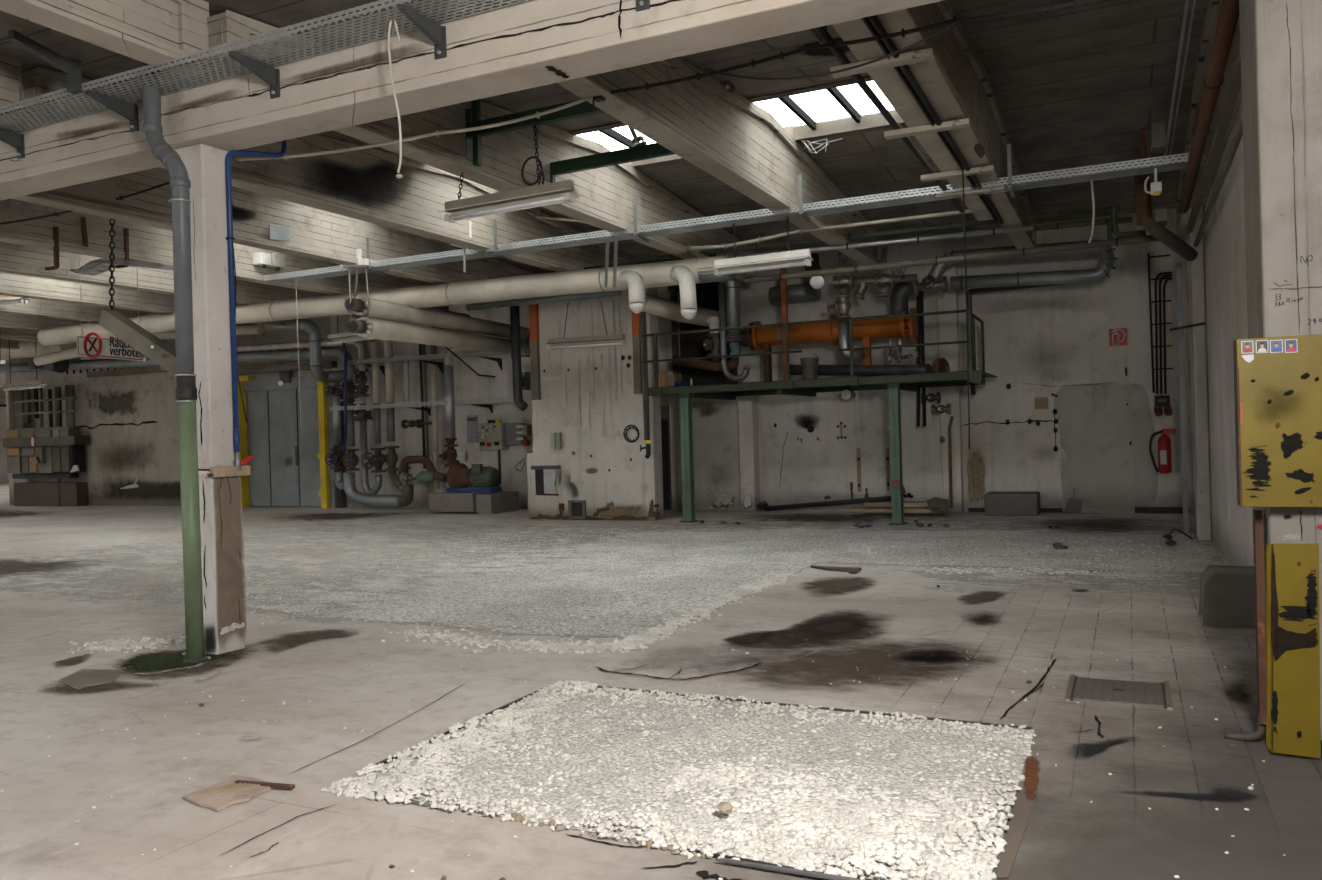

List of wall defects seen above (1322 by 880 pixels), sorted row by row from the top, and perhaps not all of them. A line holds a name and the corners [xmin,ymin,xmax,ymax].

crack [0,0,688,162]
crack [1274,3,1321,332]